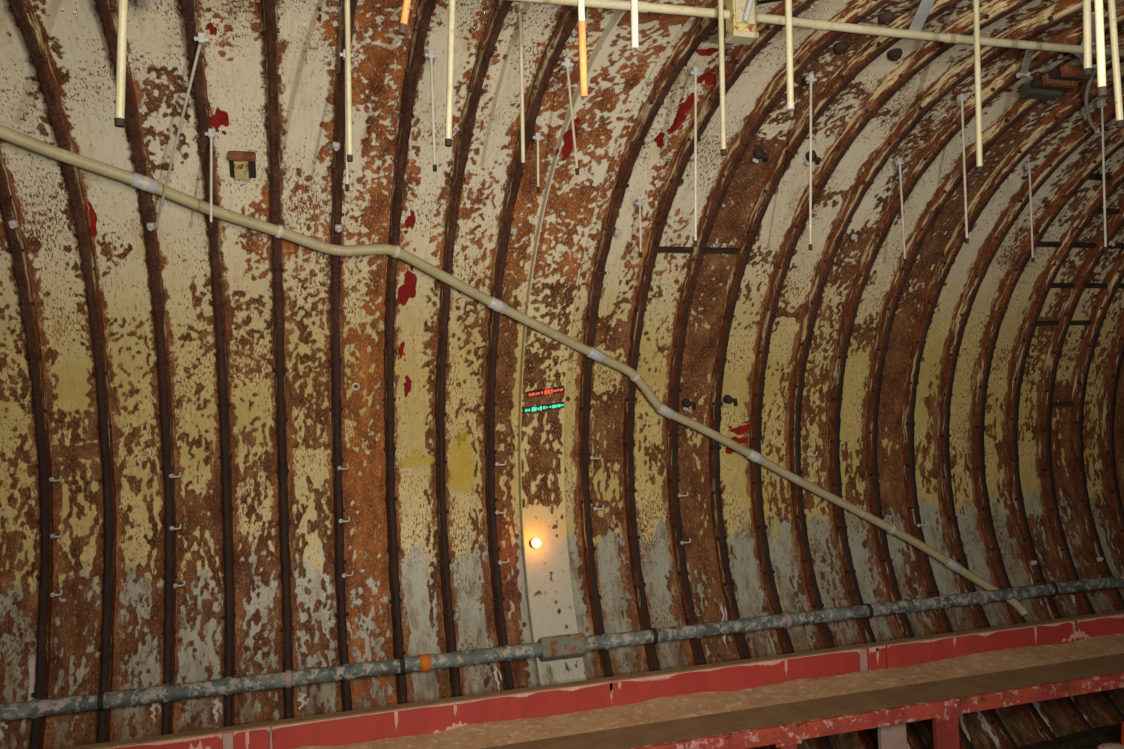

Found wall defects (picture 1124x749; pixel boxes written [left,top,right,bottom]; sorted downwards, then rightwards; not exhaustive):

peeling [210,108,229,135]
peeling [86,201,97,237]
rust [0,0,432,704]
rust [419,0,1124,699]
rust [297,675,397,716]
rust [0,718,32,749]
rust [44,688,283,749]